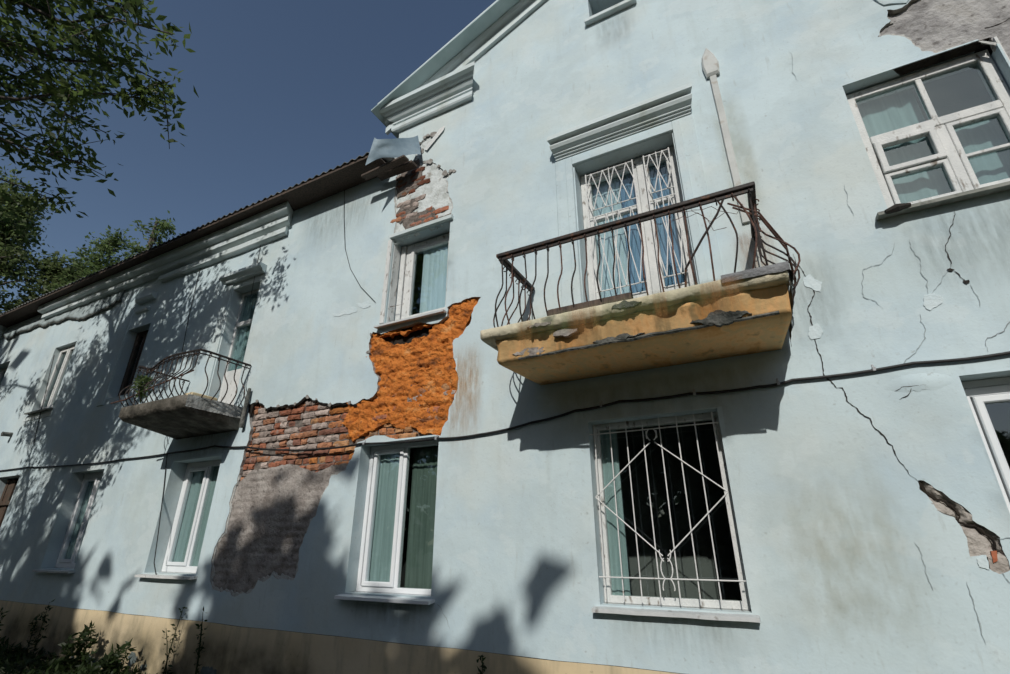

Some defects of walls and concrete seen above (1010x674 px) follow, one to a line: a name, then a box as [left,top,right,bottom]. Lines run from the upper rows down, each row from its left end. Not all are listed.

flaking render [878,0,1010,76]
flaking render [390,126,456,246]
crack [861,210,980,306]
spalling [512,261,793,360]
crack [793,255,918,481]
crack [896,315,926,398]
flaking render [185,298,480,597]
flaking render [918,481,1010,574]